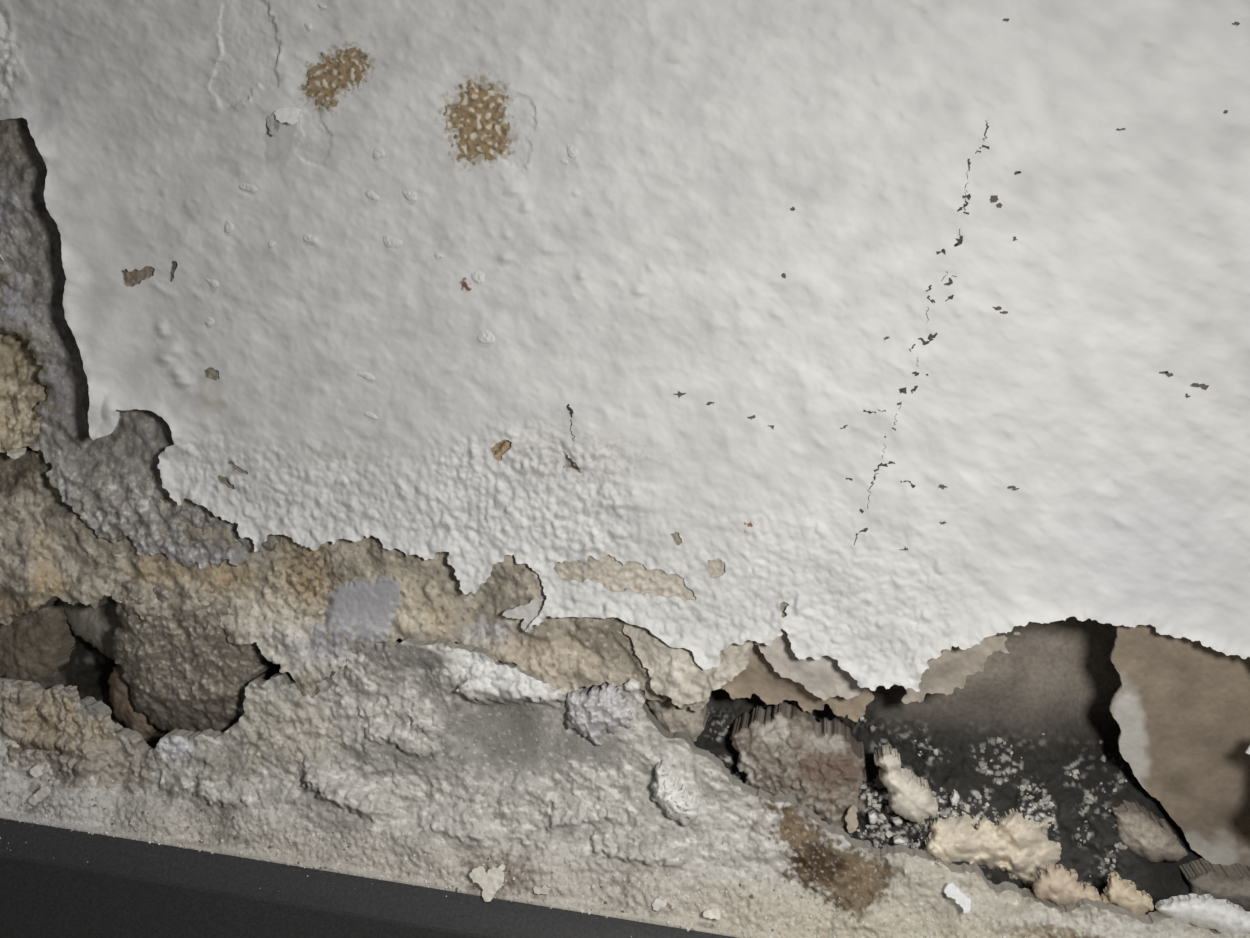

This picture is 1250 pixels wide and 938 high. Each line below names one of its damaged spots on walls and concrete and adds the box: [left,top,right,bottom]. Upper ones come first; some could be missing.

spalling [0,102,254,569]
peeling [267,108,301,137]
peeling [502,92,537,172]
crack [846,121,989,545]
spalling [0,445,1250,938]